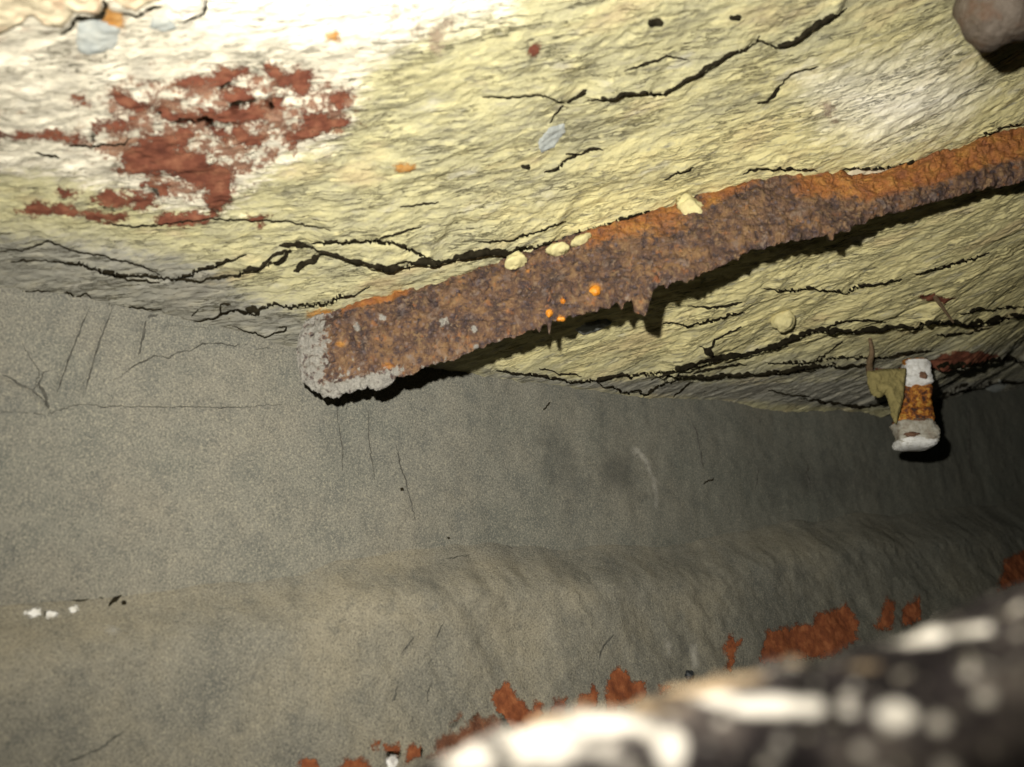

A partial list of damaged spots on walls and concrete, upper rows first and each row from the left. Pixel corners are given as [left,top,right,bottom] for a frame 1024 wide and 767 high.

crack [483,8,848,123]
corrosion [0,62,370,228]
peeling [538,124,566,153]
crack [544,147,603,173]
crack [0,201,657,380]
peeling [575,319,612,335]
corrosion [297,127,1024,399]
crack [496,302,1024,410]
corrosion [723,633,743,672]
corrosion [759,603,859,664]
corrosion [873,595,922,631]
corrosion [342,667,672,767]